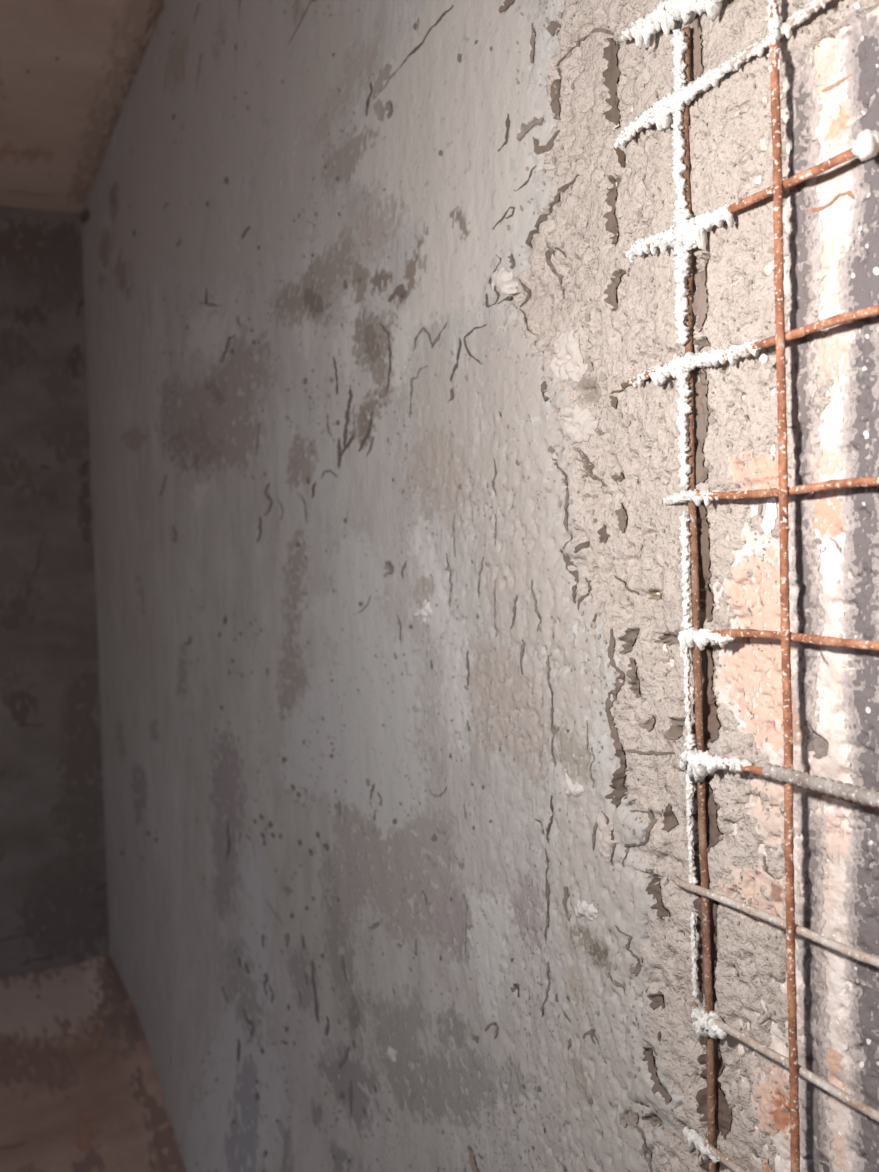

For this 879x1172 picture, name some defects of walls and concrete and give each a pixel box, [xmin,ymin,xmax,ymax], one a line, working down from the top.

crack [257,113,579,542]
crack [446,462,557,767]
spalling [516,68,561,141]
spalling [597,503,627,543]
crack [551,447,674,867]
spalling [602,0,879,1172]
rust [797,190,854,213]
water stain [782,7,879,792]
water stain [284,799,535,1139]
rust [768,879,786,902]
rust [765,1085,791,1139]
water stain [793,788,879,1172]